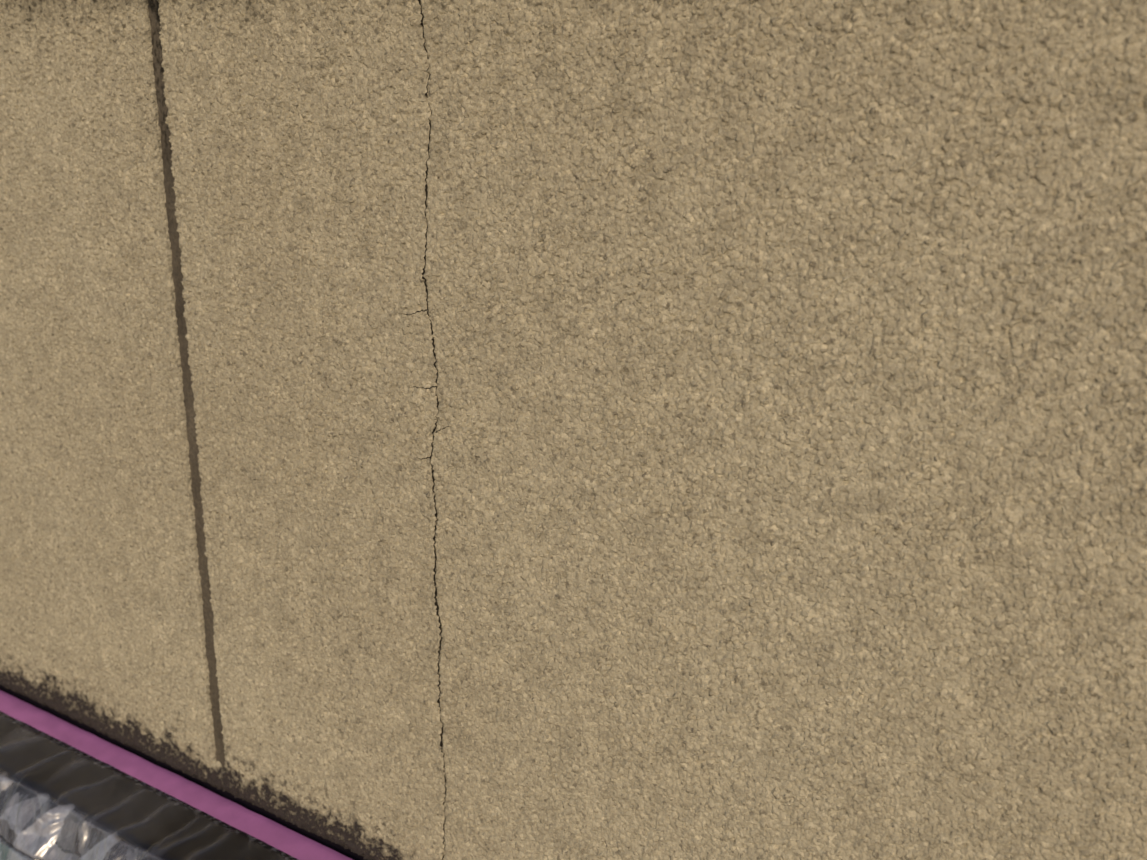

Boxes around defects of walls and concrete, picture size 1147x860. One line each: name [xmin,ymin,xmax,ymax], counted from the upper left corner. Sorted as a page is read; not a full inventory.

leakage [0,667,403,860]
crack [402,0,449,860]